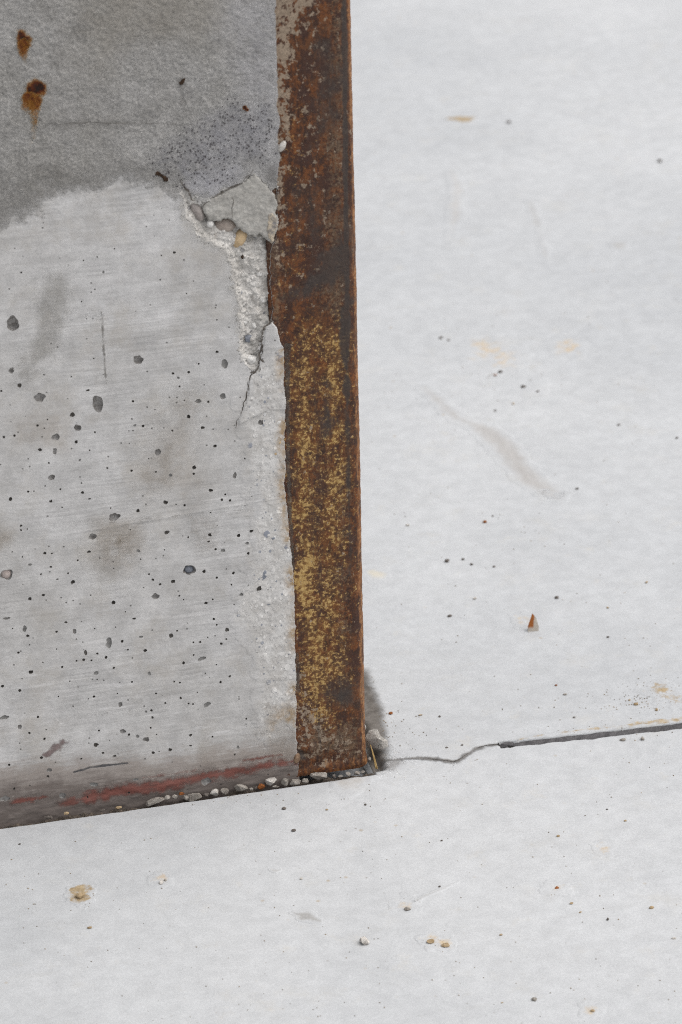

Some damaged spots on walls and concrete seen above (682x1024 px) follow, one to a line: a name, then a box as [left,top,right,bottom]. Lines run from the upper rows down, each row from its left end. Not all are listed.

rust [17,29,32,58]
rust [22,79,47,124]
peeling [0,0,297,747]
crack [236,319,273,426]
crack [382,744,498,765]